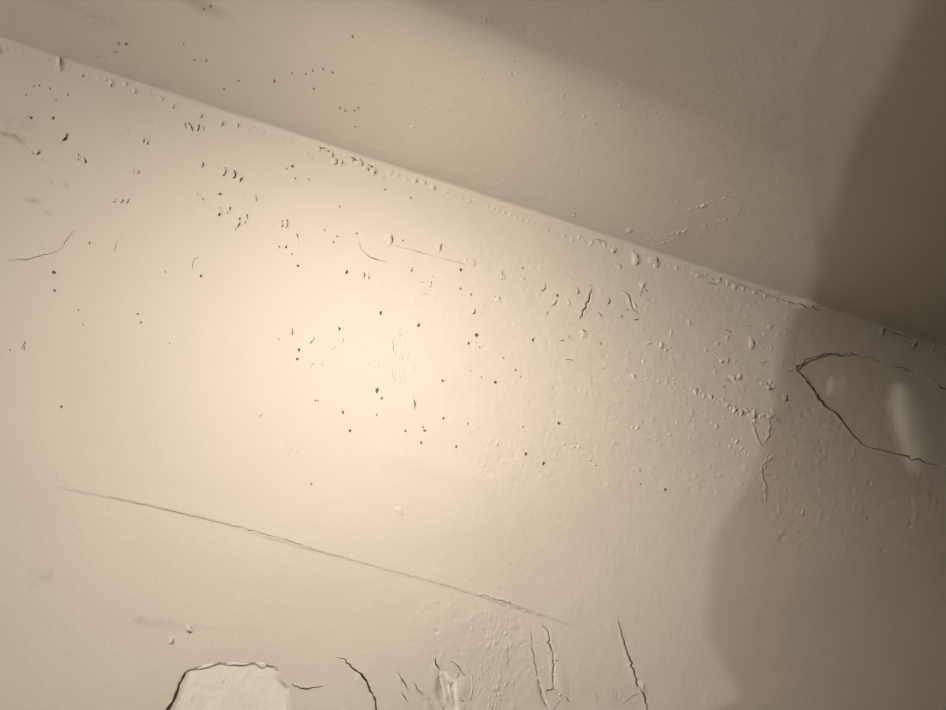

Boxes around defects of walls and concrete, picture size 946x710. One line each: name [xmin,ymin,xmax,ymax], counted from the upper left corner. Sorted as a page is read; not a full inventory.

flaking render [215,192,294,231]
crack [113,497,570,710]
peeling [165,660,293,710]
crack [616,621,648,710]